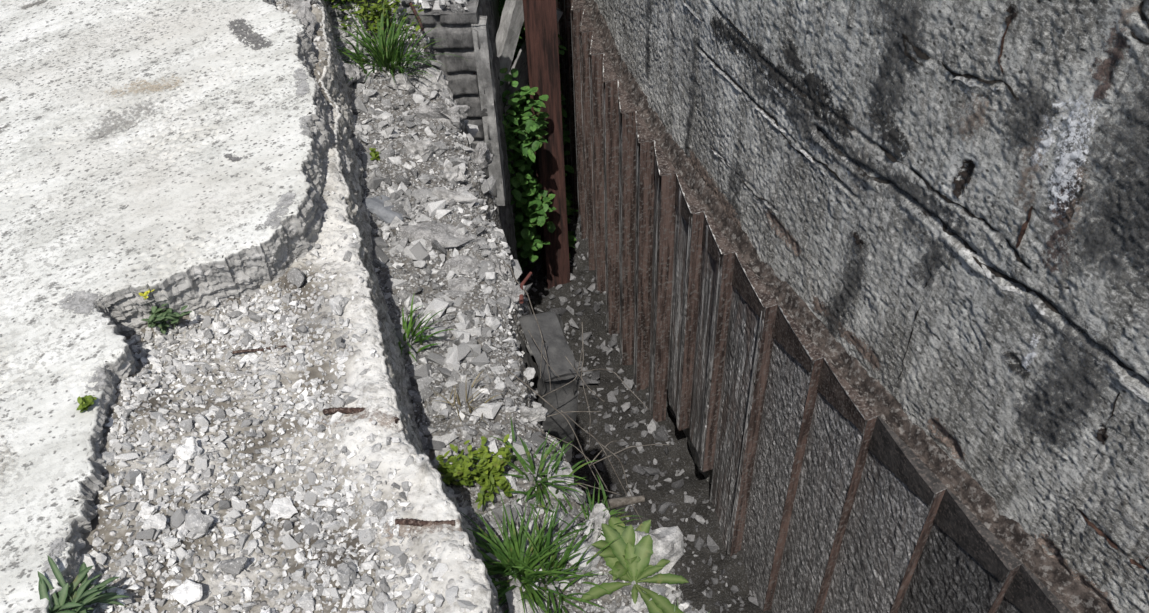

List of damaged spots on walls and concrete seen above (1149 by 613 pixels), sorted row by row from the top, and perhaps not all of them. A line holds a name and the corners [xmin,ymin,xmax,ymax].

damp [866,0,929,119]
crack [1130,1,1149,45]
crack [702,0,1030,269]
damp [1003,47,1149,293]
crack [898,263,934,380]